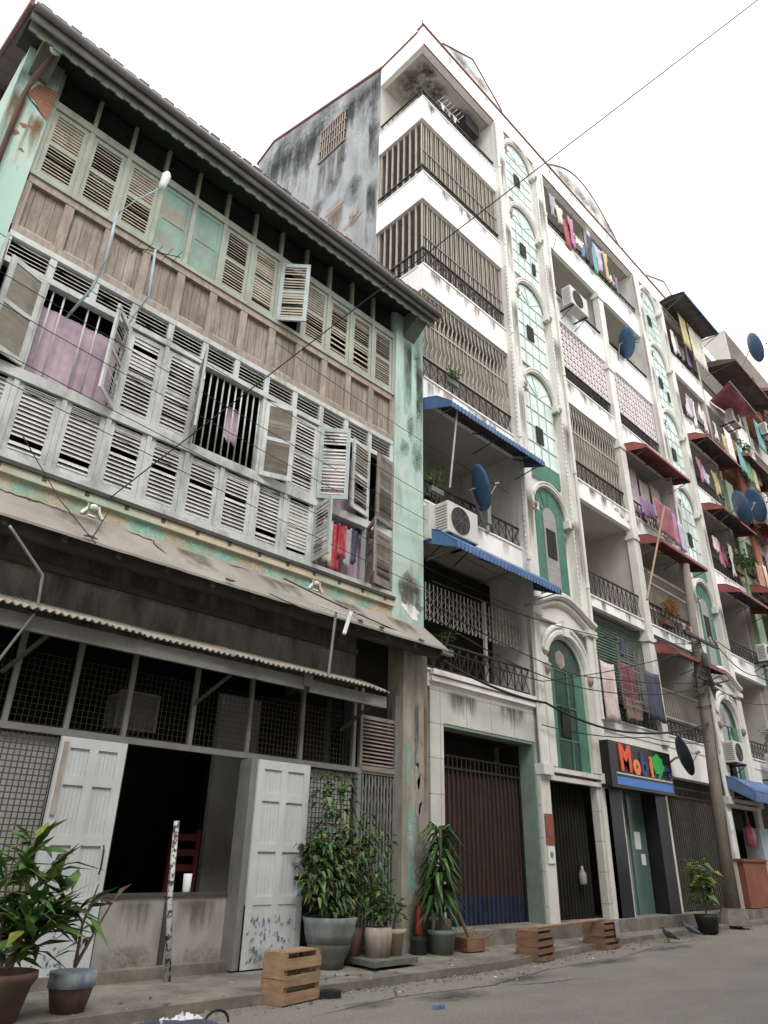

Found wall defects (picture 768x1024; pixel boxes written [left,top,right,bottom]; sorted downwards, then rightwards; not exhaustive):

corrosion [7,95,42,136]
spalling [13,84,57,135]
damp [266,107,329,180]
damp [319,77,380,185]
damp [401,65,463,121]
damp [351,179,375,211]
damp [406,347,422,413]
peeling [13,483,69,508]
peeling [133,522,232,563]
peeling [399,569,424,621]
peeling [245,914,295,964]